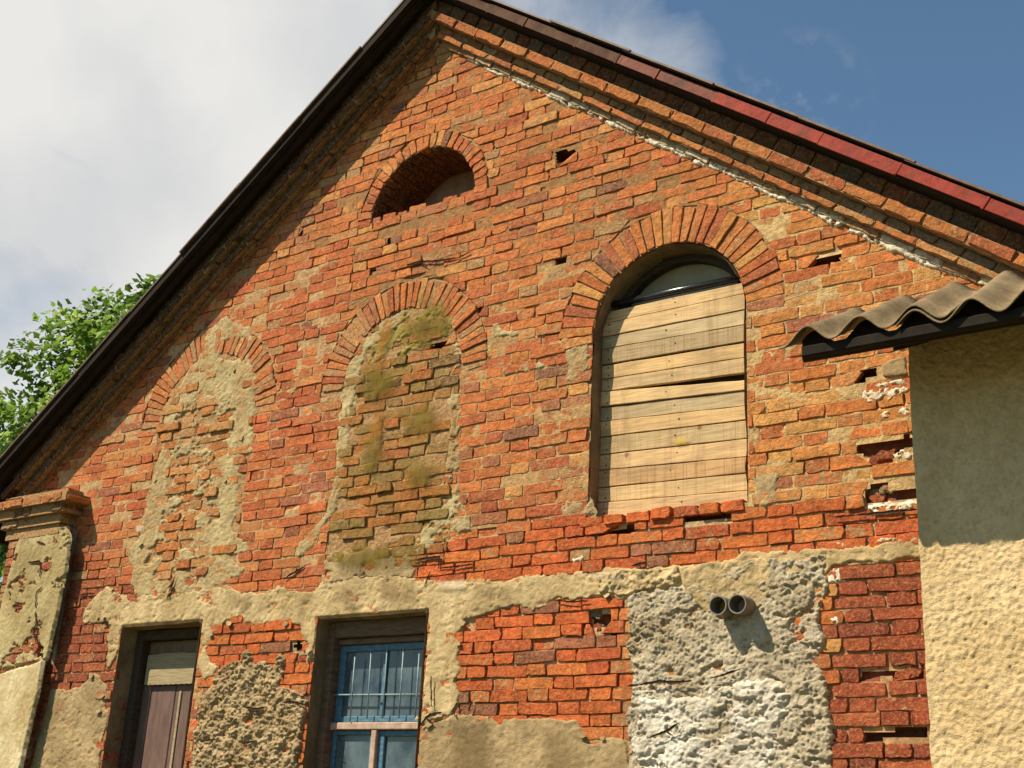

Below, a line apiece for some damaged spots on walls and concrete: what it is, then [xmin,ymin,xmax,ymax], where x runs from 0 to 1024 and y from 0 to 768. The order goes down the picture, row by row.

spalling [859,368,877,383]
spalling [857,434,913,465]
spalling [865,482,916,509]
peeling [30,316,702,768]
peeling [729,537,920,594]
peeling [0,525,72,669]